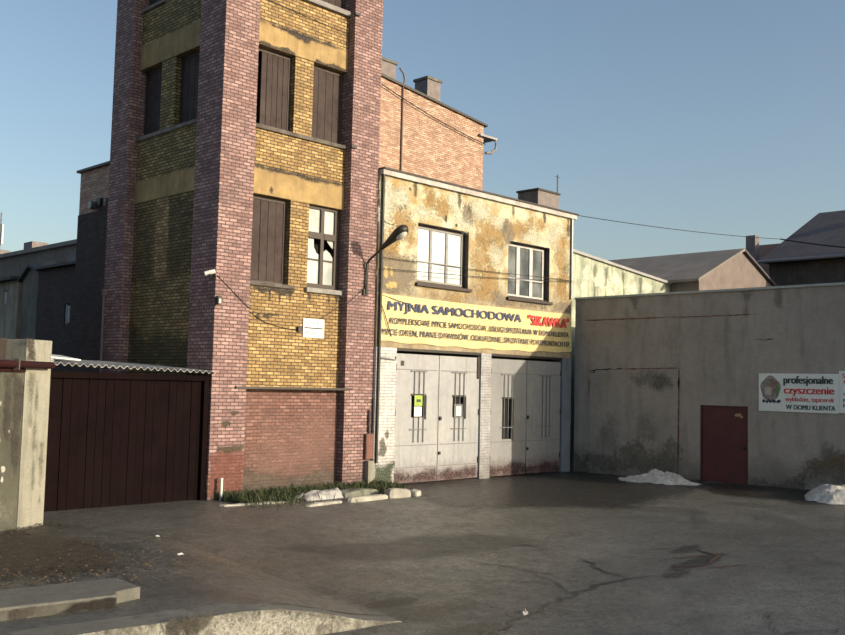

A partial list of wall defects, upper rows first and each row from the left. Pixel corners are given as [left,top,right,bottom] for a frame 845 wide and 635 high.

peeling [378,180,570,303]
corrosion [394,467,476,483]
corrosion [489,460,558,476]
crack [477,548,736,635]